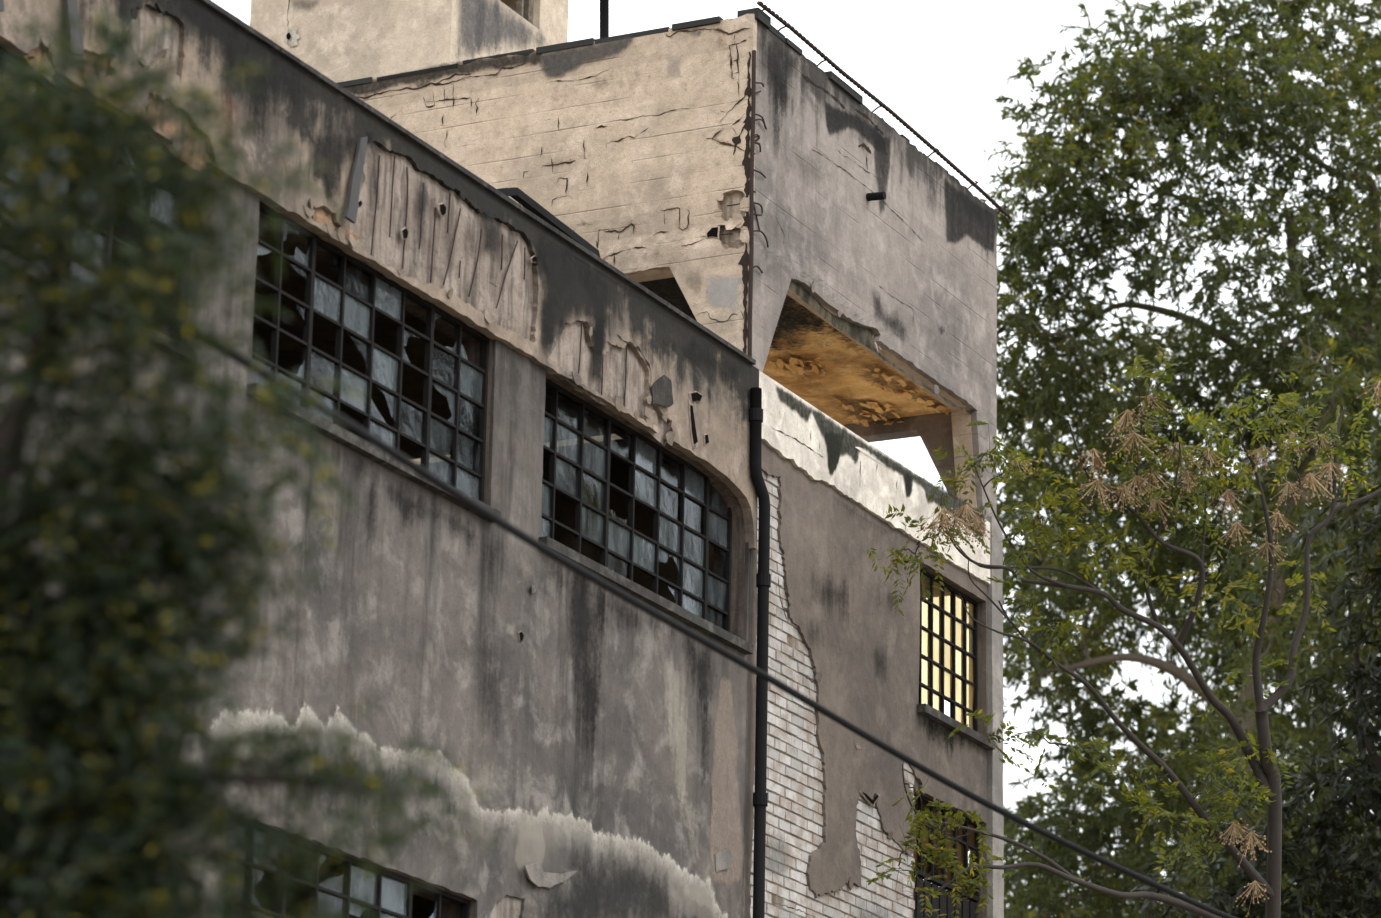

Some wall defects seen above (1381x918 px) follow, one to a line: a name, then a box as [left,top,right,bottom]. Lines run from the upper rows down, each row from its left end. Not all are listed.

damp [343,0,632,94]
damp [768,46,793,137]
damp [313,130,353,197]
crack [357,28,749,276]
damp [826,103,890,210]
damp [945,179,995,251]
damp [534,238,607,379]
damp [777,387,985,536]
flaking render [710,471,915,918]
flaking render [903,761,925,822]
flaking render [484,896,527,918]
flaking render [524,863,577,888]